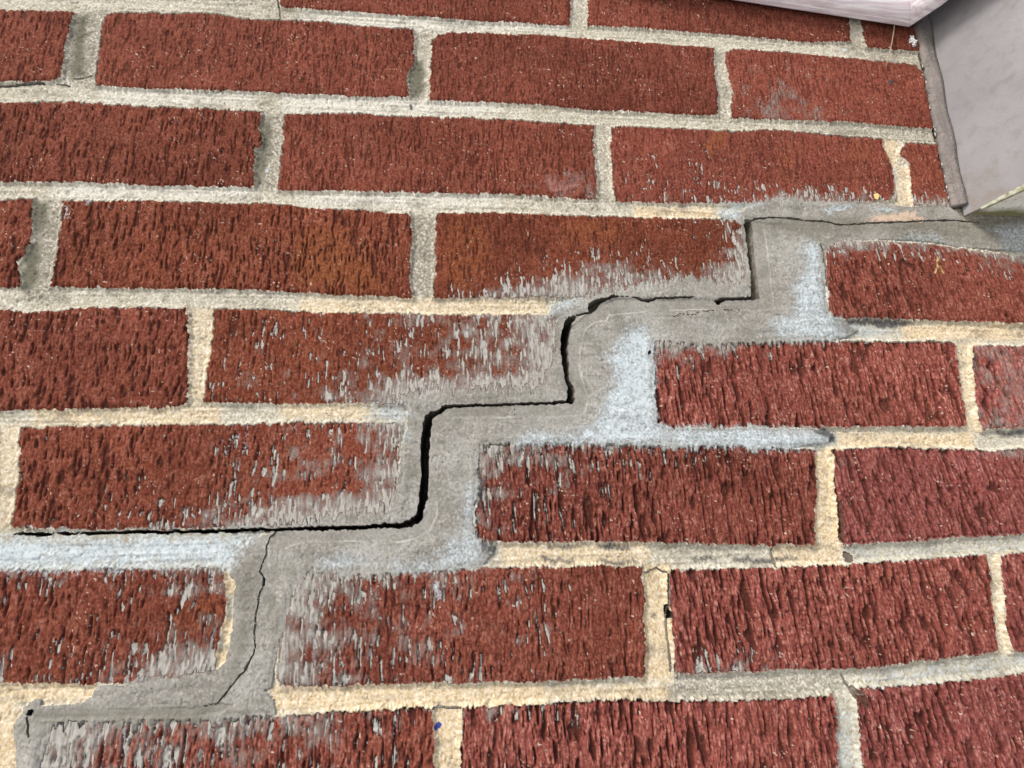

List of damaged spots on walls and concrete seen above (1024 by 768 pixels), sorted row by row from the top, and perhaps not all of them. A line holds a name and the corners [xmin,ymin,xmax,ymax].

water stain [517,327,835,450]
crack [13,217,980,708]
water stain [418,472,495,615]
water stain [0,532,255,685]
water stain [277,557,493,686]
water stain [497,579,561,656]
water stain [41,710,343,768]
water stain [372,710,409,768]
water stain [515,703,578,726]